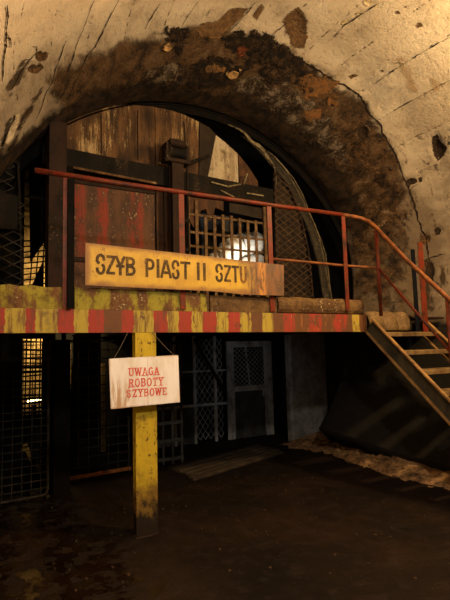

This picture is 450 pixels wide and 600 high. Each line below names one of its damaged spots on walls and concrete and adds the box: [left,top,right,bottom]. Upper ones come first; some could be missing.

crack [2,5,37,89]
spalling [28,51,49,74]
spalling [291,11,307,39]
damp [48,4,412,312]
crack [262,22,443,282]
spalling [432,135,450,161]